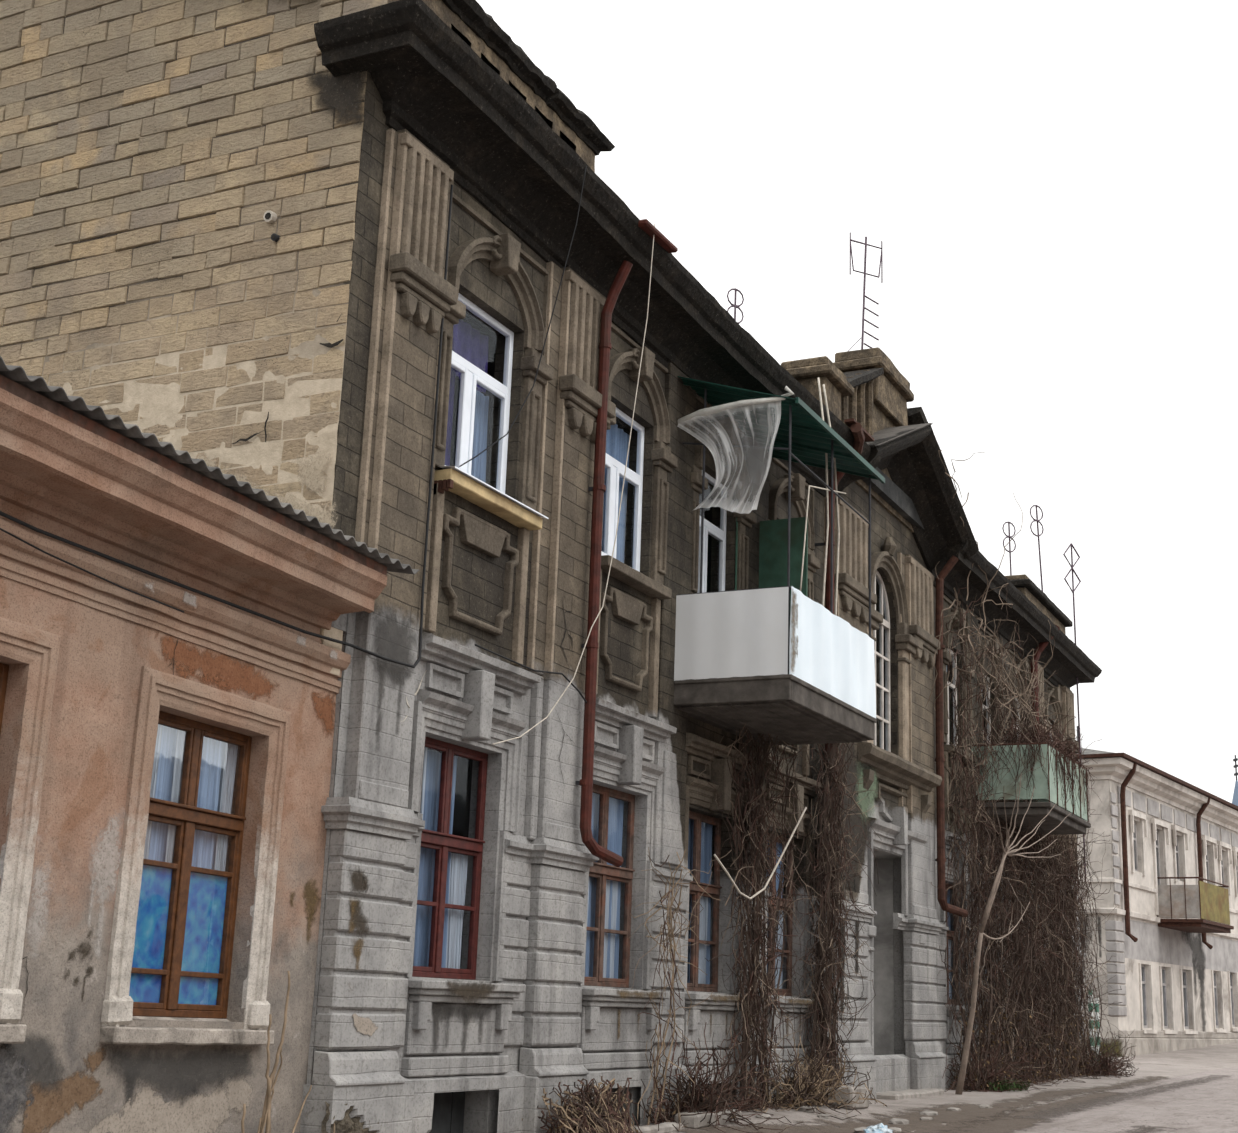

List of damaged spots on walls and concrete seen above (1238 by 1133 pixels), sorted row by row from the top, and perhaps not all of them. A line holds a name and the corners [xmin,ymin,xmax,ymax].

peeling [156,633,275,700]
damp [7,1037,63,1089]
peeling [0,1043,106,1133]
flaking render [321,1102,382,1133]